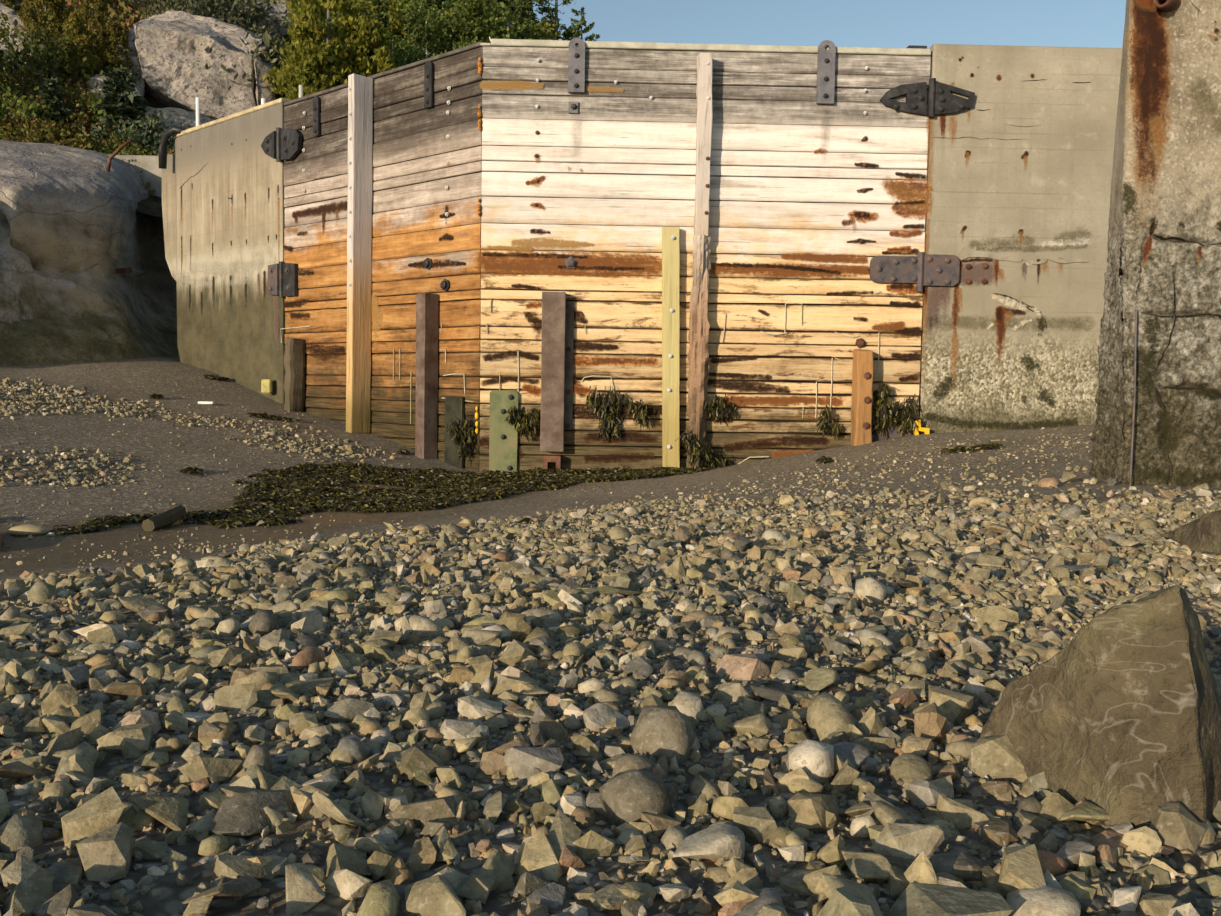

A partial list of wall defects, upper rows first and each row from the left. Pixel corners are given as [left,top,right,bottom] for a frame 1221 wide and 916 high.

rust [1130,0,1169,177]
rust [841,210,878,229]
rust [882,108,970,255]
crack [1150,220,1221,246]
rust [886,258,1003,373]
rust [995,306,1025,367]
crack [1136,277,1221,479]